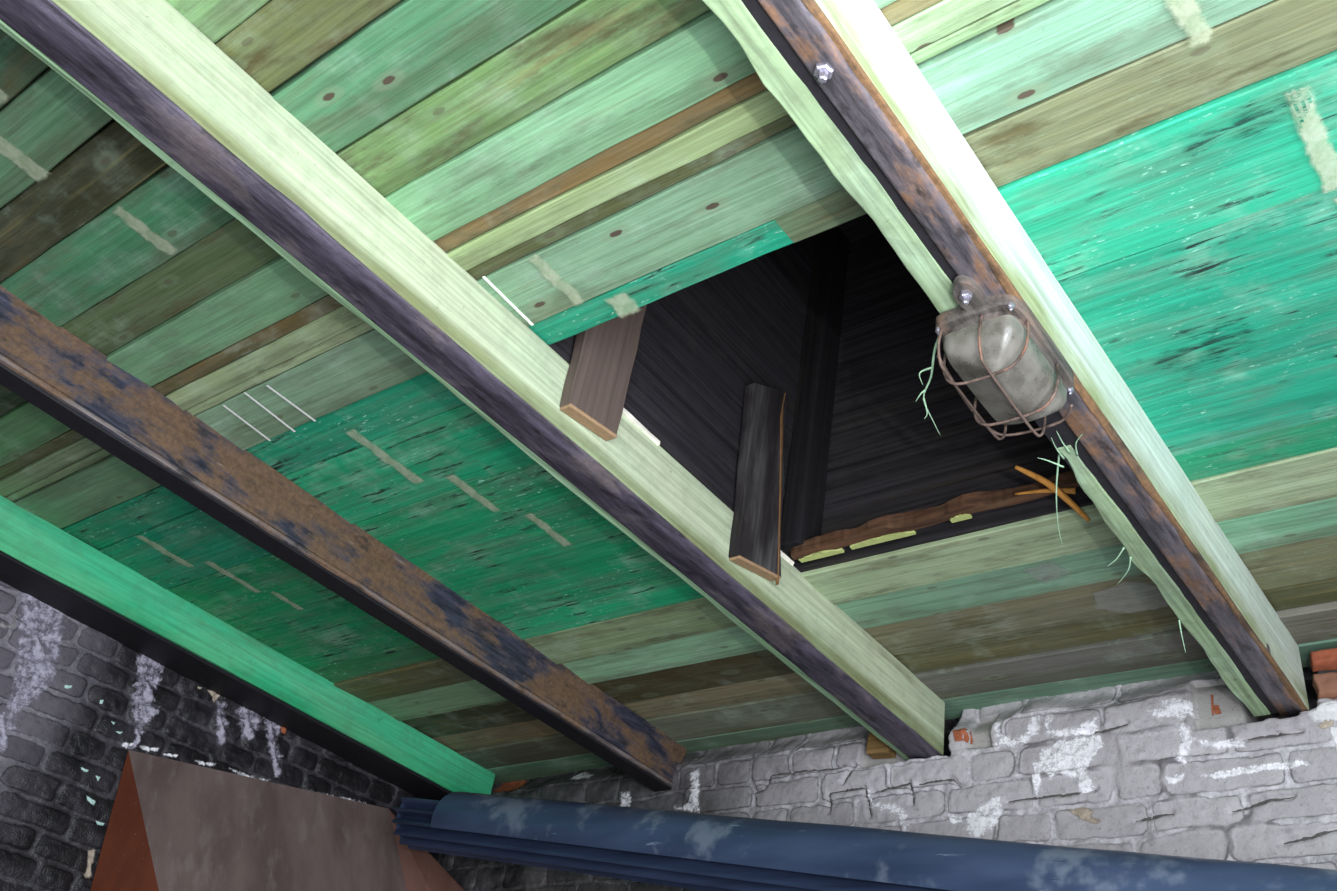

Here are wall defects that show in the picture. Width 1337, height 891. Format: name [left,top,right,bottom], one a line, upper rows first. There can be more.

rust [801,0,1027,304]
rust [1069,365,1308,712]
damp [0,593,65,751]
damp [122,654,178,757]
damp [992,714,1104,795]
flaking render [1309,648,1337,701]